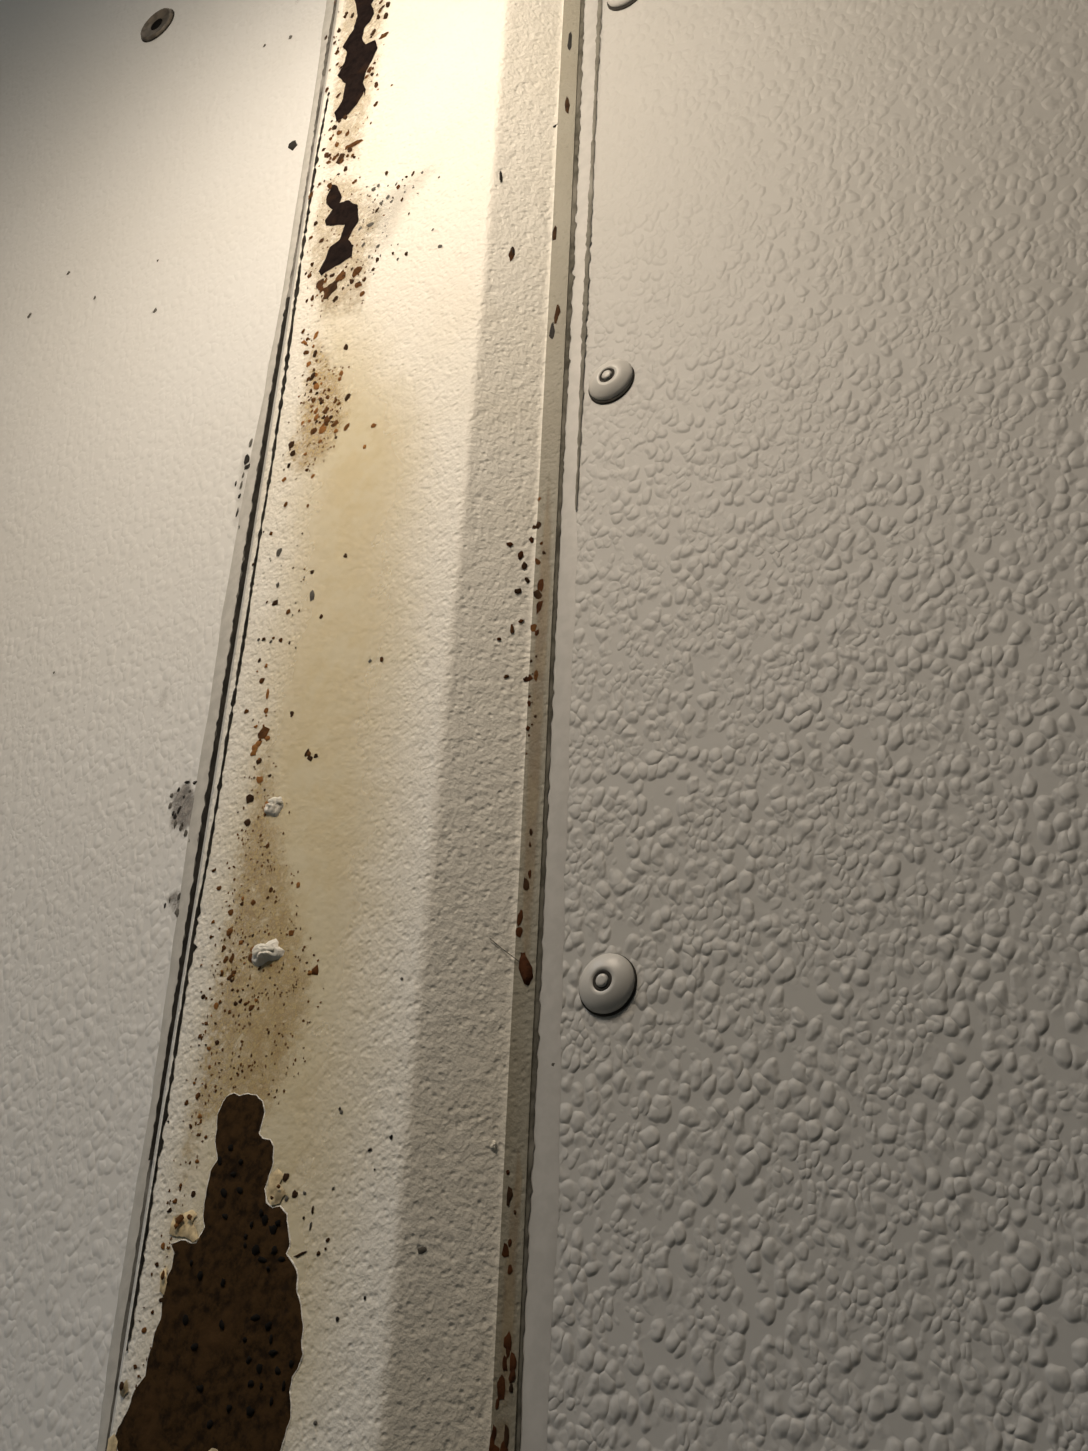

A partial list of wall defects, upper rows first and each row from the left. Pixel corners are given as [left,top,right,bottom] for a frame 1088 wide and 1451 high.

rust [281,0,393,482]
rust [252,531,323,619]
rust [497,521,546,641]
rust [503,655,538,755]
leakage [243,415,384,1256]
rust [490,910,533,985]
rust [506,1170,516,1214]
rust [502,1239,513,1275]
rust [489,1332,517,1451]